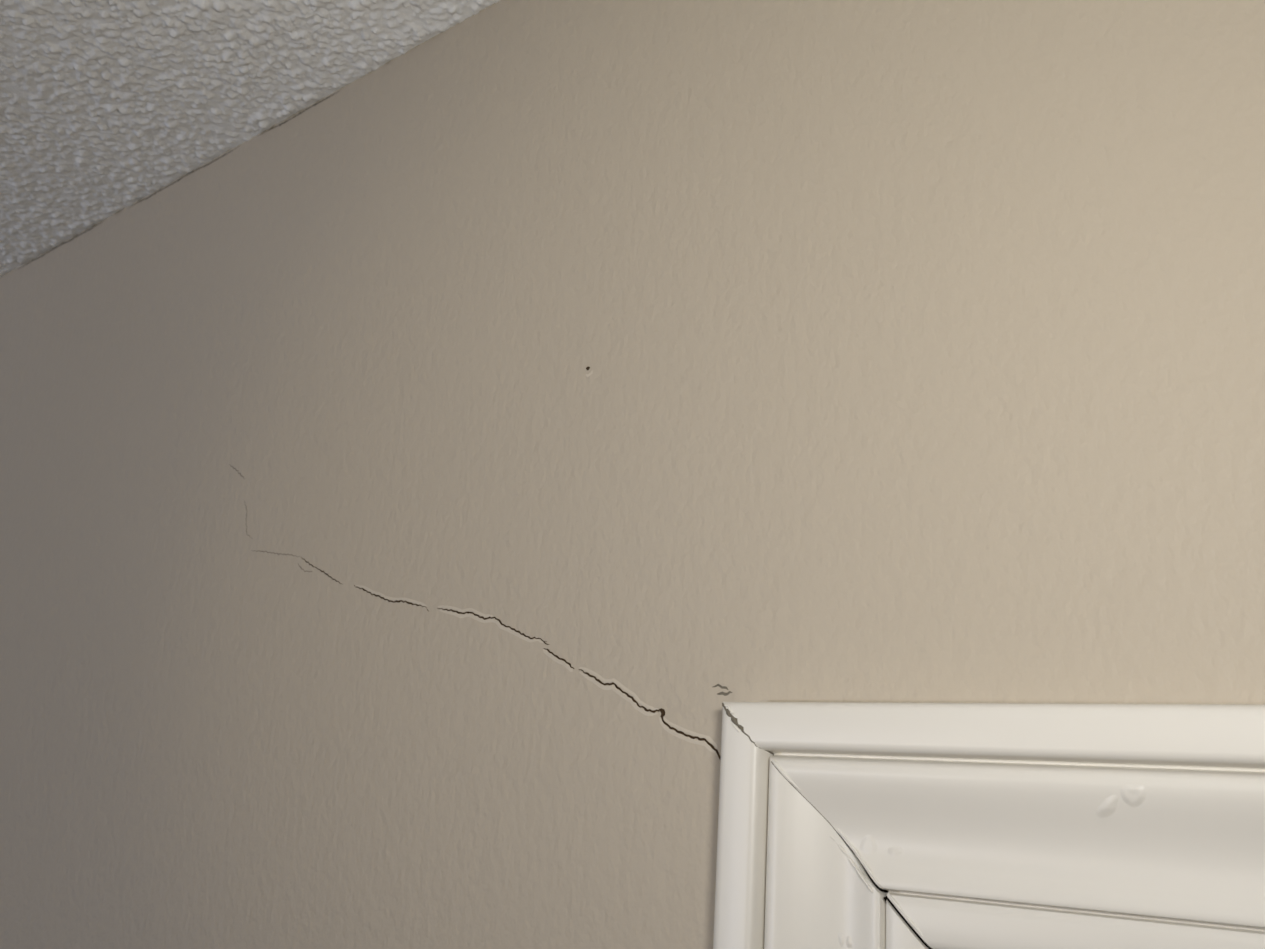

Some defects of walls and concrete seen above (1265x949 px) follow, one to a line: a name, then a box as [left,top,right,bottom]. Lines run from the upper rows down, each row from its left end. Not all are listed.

crack [230,465,932,949]